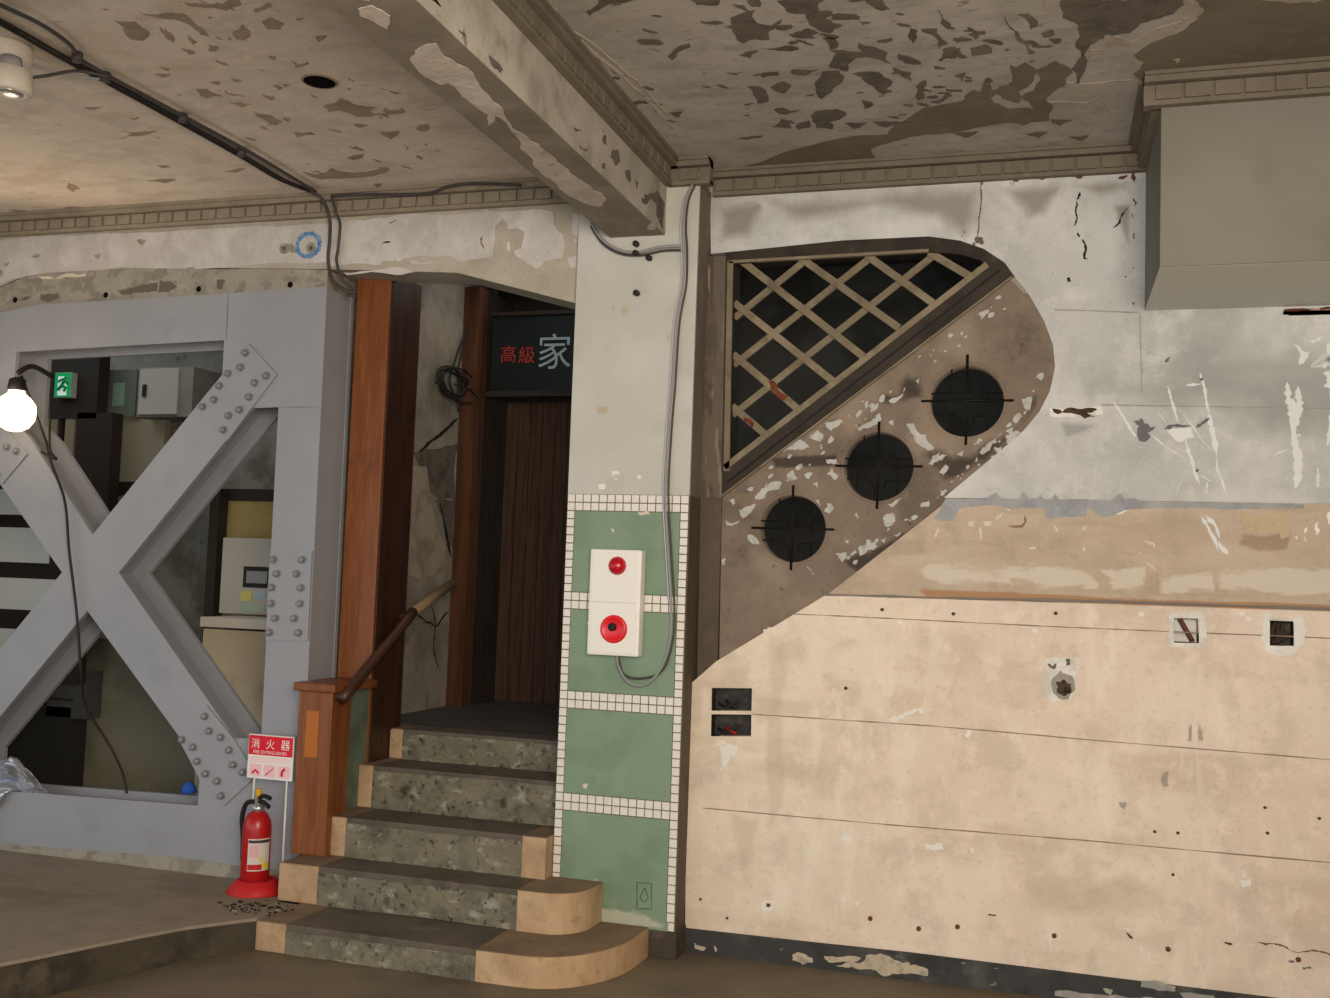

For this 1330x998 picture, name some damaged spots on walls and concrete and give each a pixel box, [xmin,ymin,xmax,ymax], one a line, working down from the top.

peeling [102,0,440,187]
peeling [586,0,632,16]
peeling [636,15,691,60]
peeling [691,0,1330,167]
peeling [0,43,606,283]
peeling [602,135,665,230]
crack [1052,192,1127,282]
peeling [1294,337,1330,389]
peeling [725,372,1330,564]
crack [408,418,458,670]
peeling [792,952,928,976]
peeling [1055,981,1215,998]